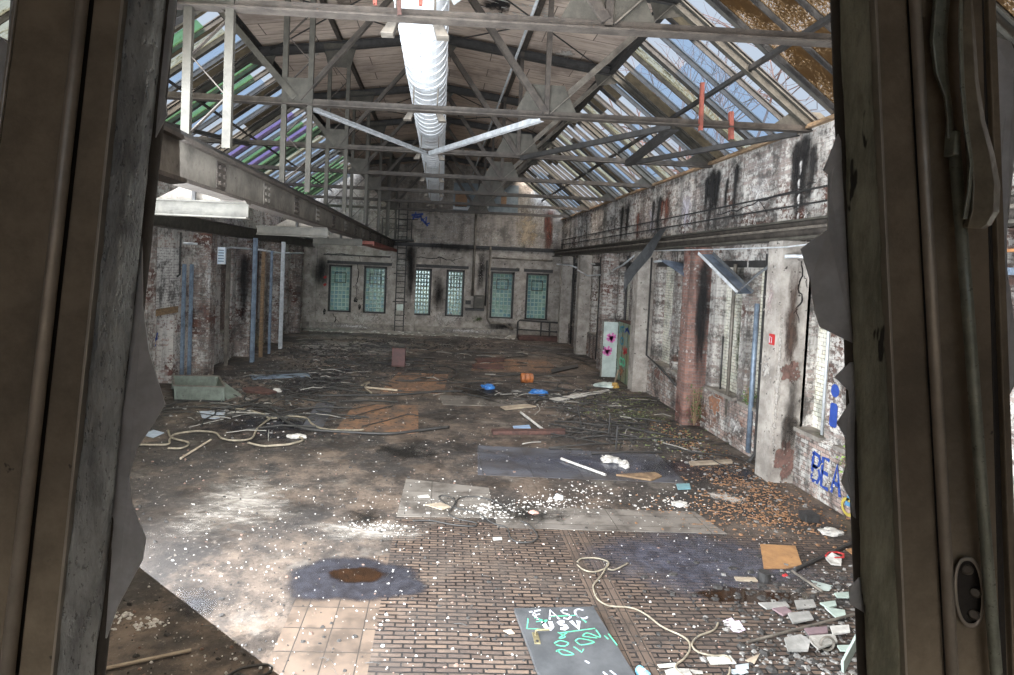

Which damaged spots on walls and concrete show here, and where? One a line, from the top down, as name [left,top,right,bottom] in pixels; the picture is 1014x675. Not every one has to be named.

leakage [704,164,766,224]
leakage [791,136,817,219]
leakage [407,246,415,292]